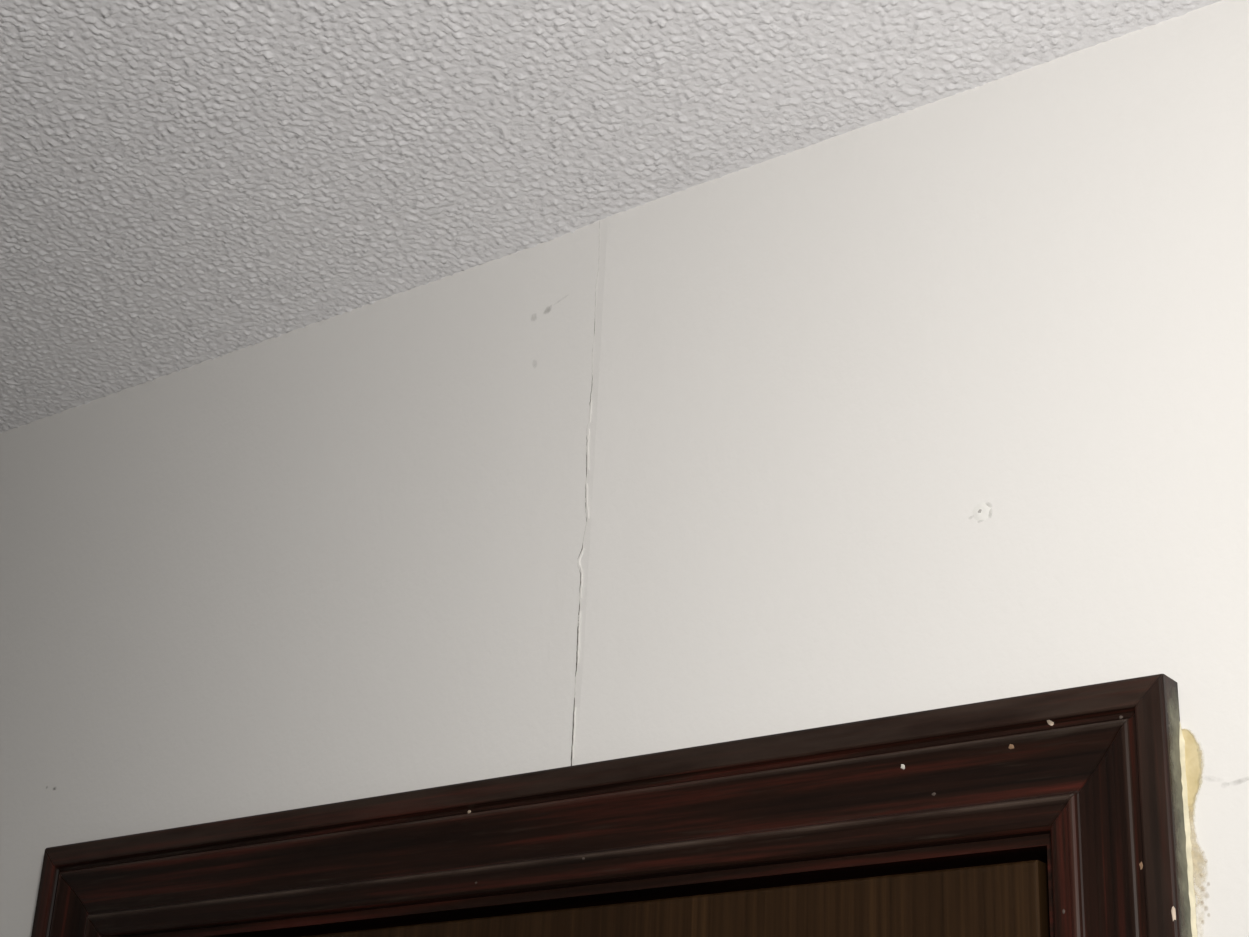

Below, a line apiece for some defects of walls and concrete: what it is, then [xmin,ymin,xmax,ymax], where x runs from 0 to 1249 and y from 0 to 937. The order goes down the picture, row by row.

crack [571,221,600,766]